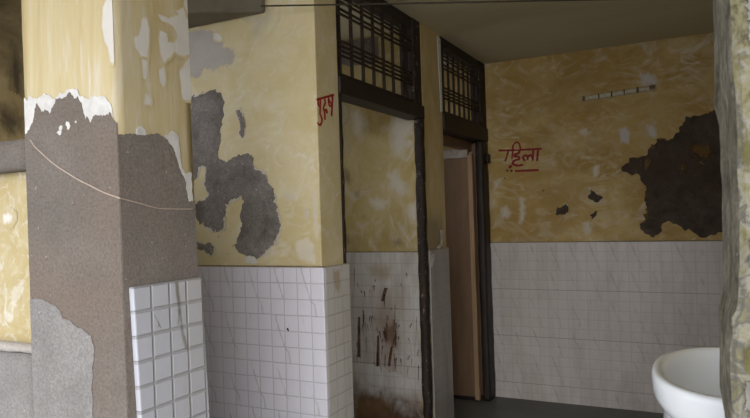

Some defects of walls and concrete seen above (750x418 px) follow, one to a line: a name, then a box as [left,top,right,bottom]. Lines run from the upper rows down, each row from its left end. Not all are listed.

water stain [0,28,25,142]
flaking render [24,0,282,418]
flaking render [556,203,569,215]
flaking render [614,110,722,238]
corrosion [331,252,423,418]